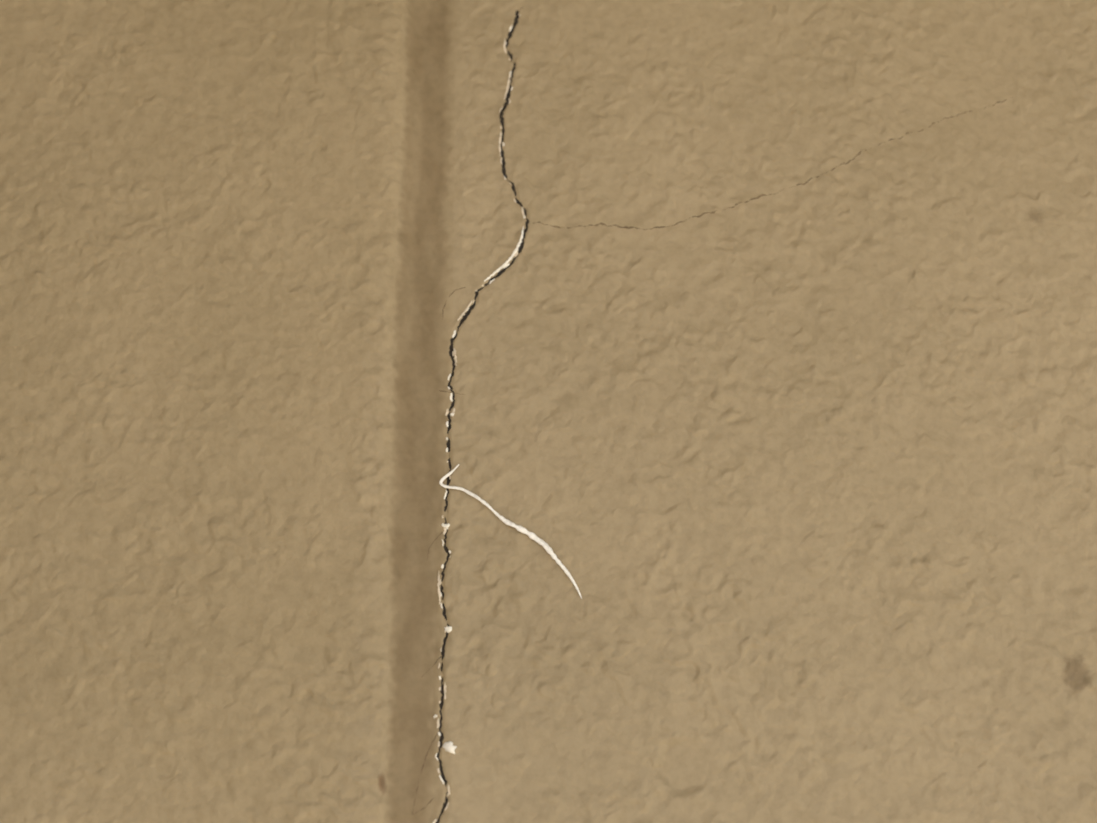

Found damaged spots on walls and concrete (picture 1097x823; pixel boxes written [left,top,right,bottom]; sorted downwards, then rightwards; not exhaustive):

crack [412,7,1013,823]